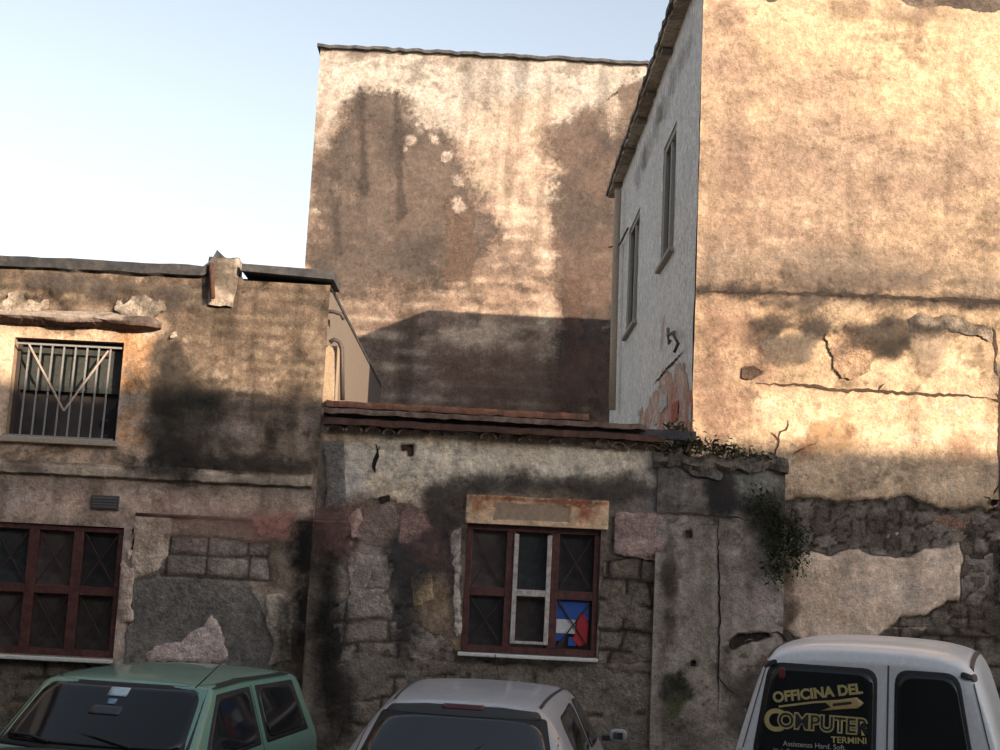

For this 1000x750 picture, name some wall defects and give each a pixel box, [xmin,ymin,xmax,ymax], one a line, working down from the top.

flaking render [902,0,1000,13]
water stain [306,84,500,300]
water stain [539,68,642,413]
water stain [753,263,968,373]
water stain [113,340,312,483]
flaking render [638,362,693,431]
crack [697,290,1000,512]
peeling [117,536,275,670]
crack [658,512,747,704]
flaking render [783,495,1000,699]
flaking render [0,659,101,733]
water stain [660,670,694,718]